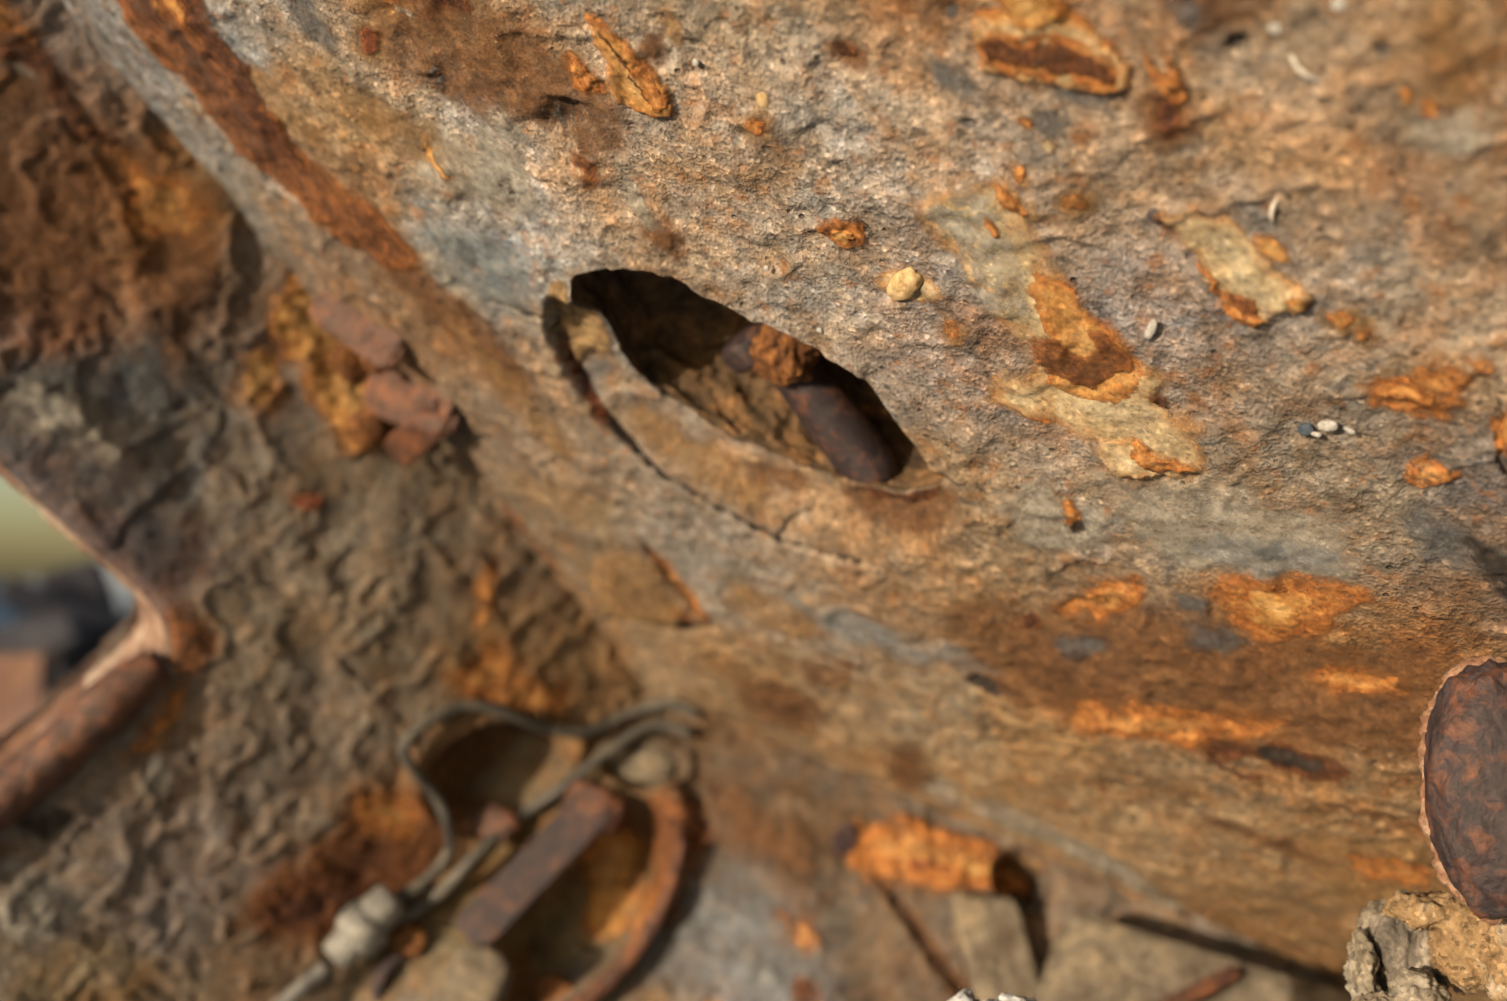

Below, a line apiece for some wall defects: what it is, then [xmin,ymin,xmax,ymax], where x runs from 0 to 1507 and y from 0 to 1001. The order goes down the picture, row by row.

rust [356,0,622,190]
rust [115,0,526,397]
peeling [910,278,939,303]
crack [490,301,875,565]
spalling [546,268,849,479]
spalling [821,355,944,490]
rust [1368,356,1494,446]
rust [1405,455,1461,489]
rust [954,572,1437,750]
spalling [0,895,57,938]
rust [231,792,464,946]
rust [831,812,1032,898]